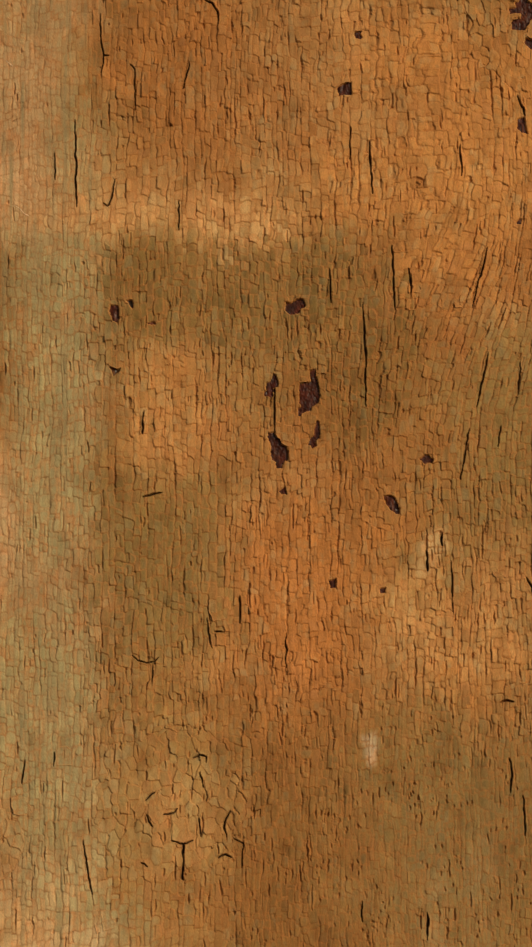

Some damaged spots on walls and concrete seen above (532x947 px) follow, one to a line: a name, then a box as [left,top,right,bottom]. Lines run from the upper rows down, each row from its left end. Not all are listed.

peeling [509,0,532,50]
peeling [331,78,352,96]
peeling [517,118,527,134]
crack [53,121,78,208]
crack [348,127,374,194]
peeling [285,300,305,315]
crack [391,246,412,310]
peeling [267,370,320,468]
crack [459,352,489,480]
peeling [384,496,399,514]
crack [425,532,453,612]
crack [145,792,244,881]